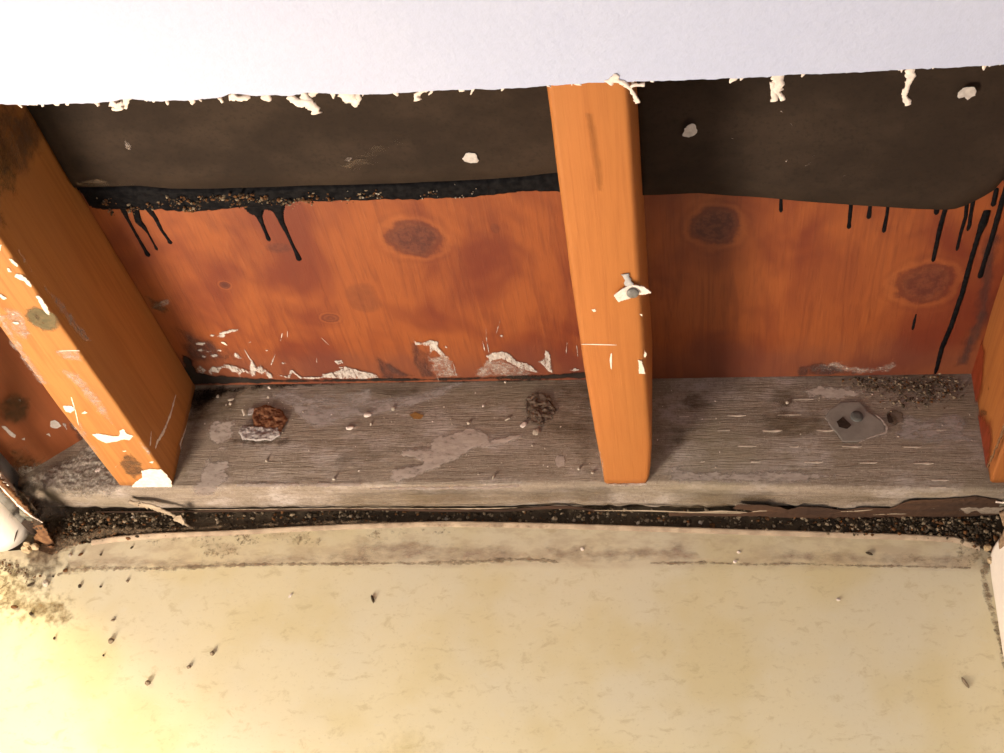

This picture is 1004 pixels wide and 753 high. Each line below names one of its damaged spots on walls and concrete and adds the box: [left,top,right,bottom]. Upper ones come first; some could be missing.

water stain [256,211,302,261]
water stain [931,210,947,262]
water stain [934,188,1004,374]
water stain [960,307,986,401]
water stain [978,415,991,465]